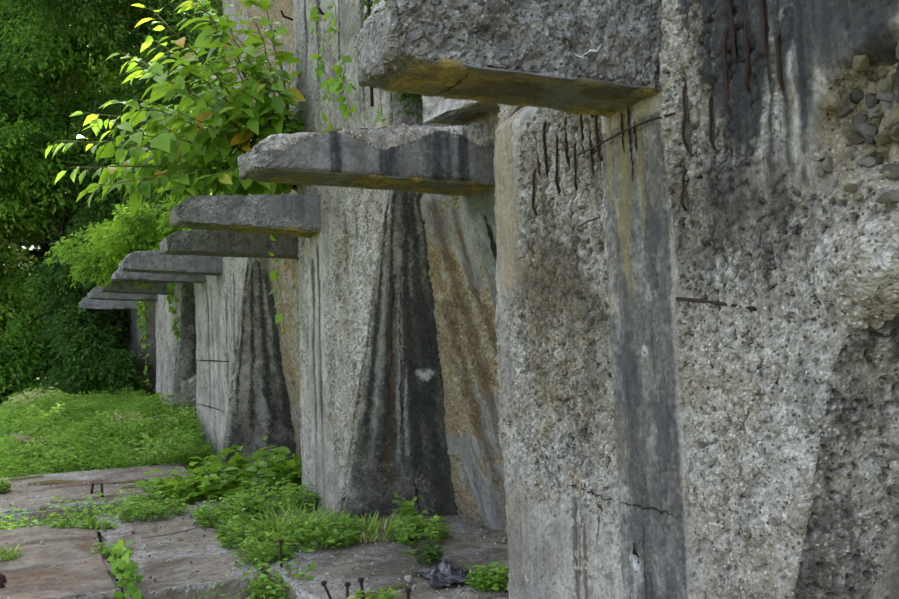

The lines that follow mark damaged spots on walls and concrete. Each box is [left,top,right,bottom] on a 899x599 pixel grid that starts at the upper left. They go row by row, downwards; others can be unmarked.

water stain [304,0,320,65]
water stain [331,132,342,172]
spalling [814,39,899,204]
water stain [181,283,197,381]
water stain [225,246,323,463]
water stain [229,225,321,238]
water stain [347,58,586,518]
water stain [558,0,899,599]
water stain [349,540,497,588]
crack [567,484,679,599]